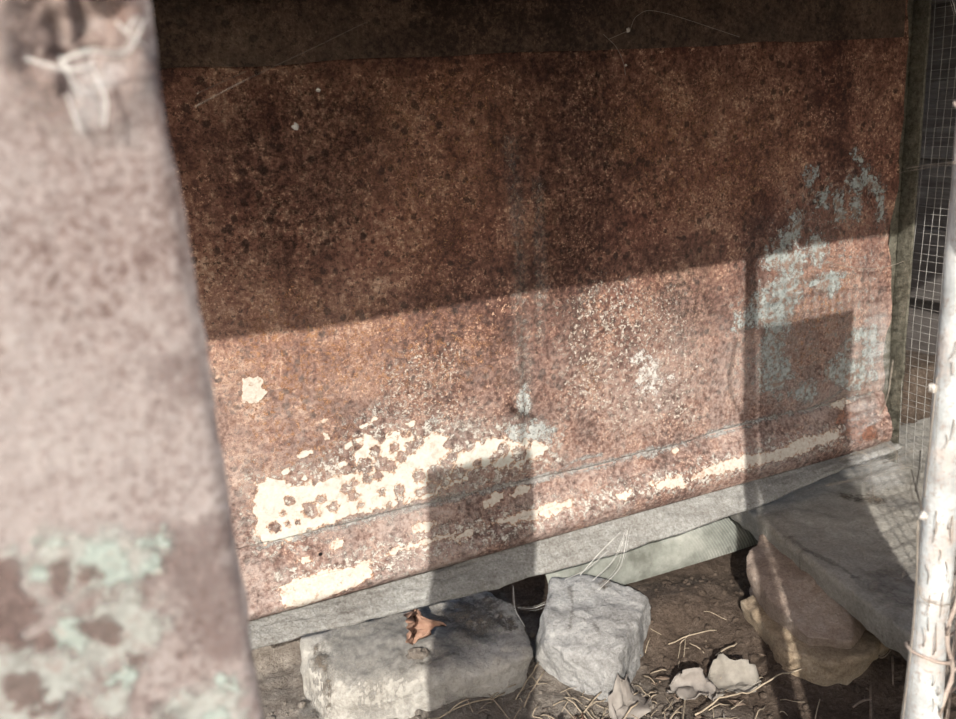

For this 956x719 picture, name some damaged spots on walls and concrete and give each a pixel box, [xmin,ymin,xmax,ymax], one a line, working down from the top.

peeling [802,147,887,229]
peeling [241,376,268,404]
rust [225,292,483,471]
peeling [600,291,674,408]
peeling [732,208,882,411]
rust [835,408,877,445]
peeling [240,384,850,613]
peeling [0,524,172,719]
peeling [153,673,247,719]